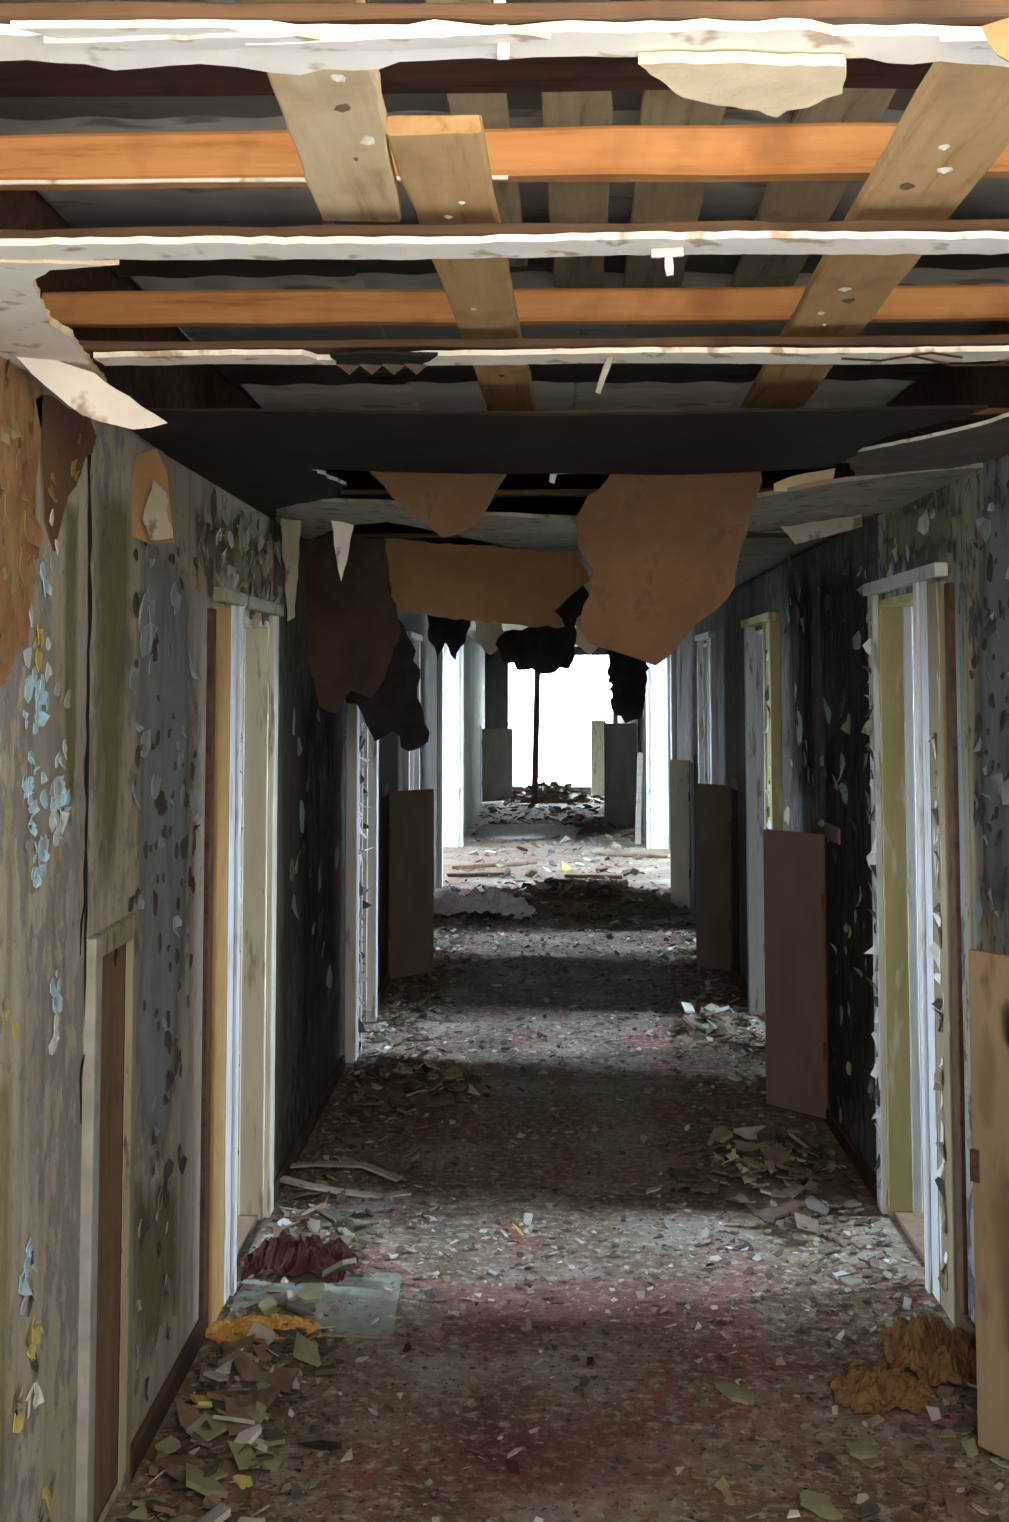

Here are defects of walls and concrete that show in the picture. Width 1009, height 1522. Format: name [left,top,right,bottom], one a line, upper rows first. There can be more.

spalling [638,51,846,117]
spalling [330,350,438,375]
spalling [0,356,97,888]
peeling [765,479,1009,1189]
peeling [933,1057,947,1233]
peeling [938,1252,948,1292]